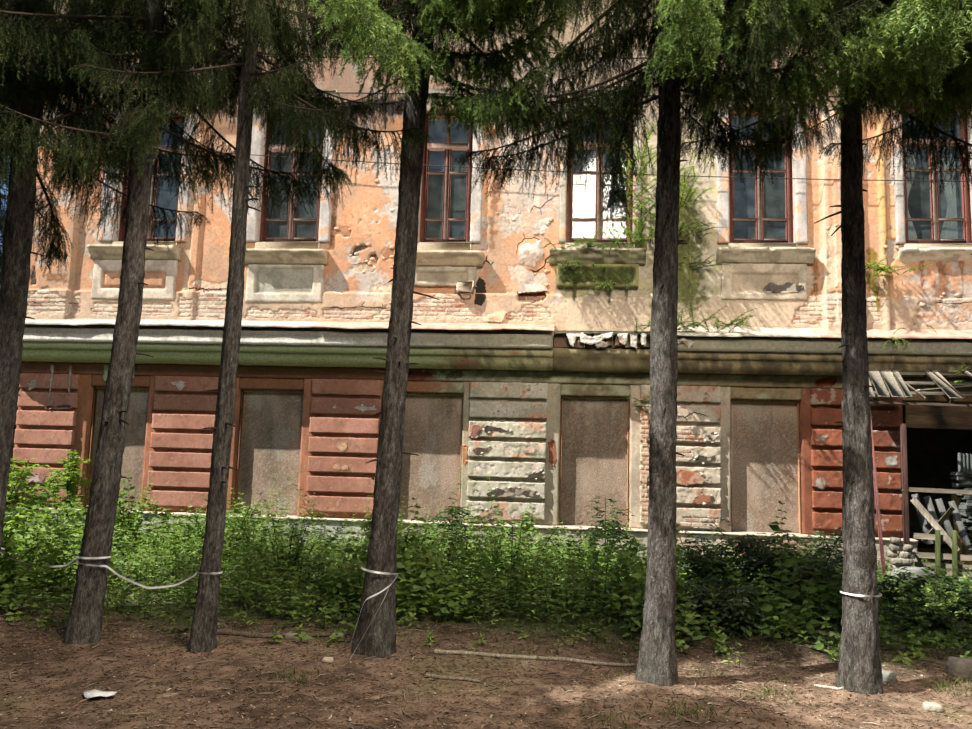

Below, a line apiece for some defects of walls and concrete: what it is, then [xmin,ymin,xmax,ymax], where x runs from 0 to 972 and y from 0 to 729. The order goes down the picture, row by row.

peeling [370,148,400,219]
spalling [334,227,395,273]
flaking render [27,266,118,317]
flaking render [141,280,228,318]
flaking render [412,293,551,322]
spalling [508,265,550,293]
flaking render [866,296,885,324]
spalling [914,290,972,325]
spalling [568,333,650,349]
peeling [462,425,513,465]
peeling [478,439,556,520]
flaking render [676,429,720,528]